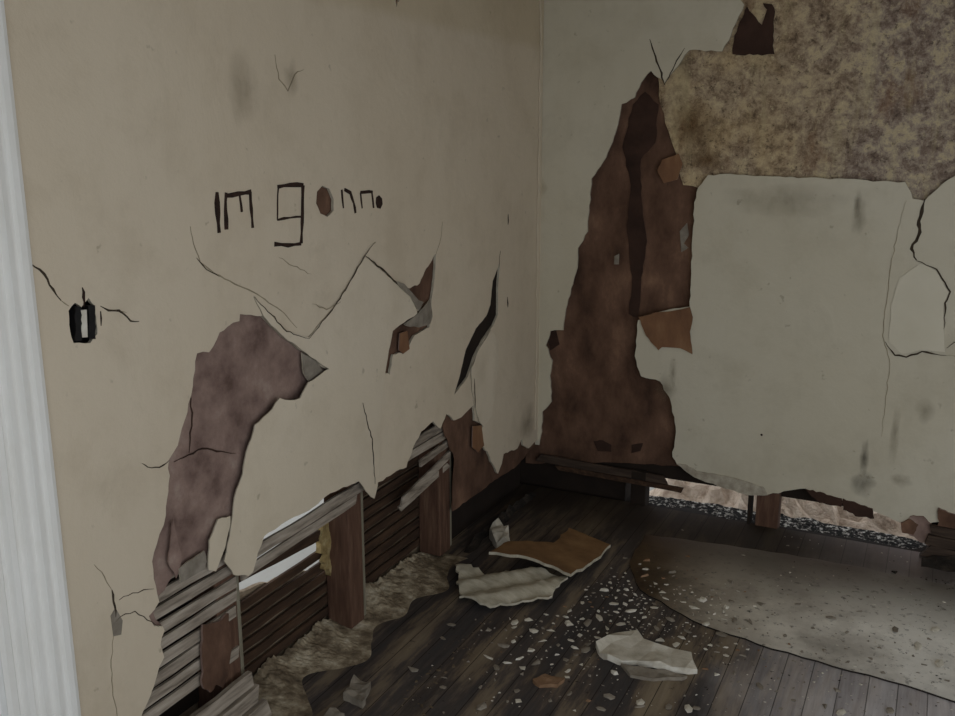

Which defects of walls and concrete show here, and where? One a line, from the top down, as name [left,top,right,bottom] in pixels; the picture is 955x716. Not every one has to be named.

crack [32,264,69,306]
crack [100,306,139,326]
crack [190,226,297,328]
crack [456,251,509,427]
flaking render [442,0,955,539]
crack [881,199,955,436]
flaking render [143,222,443,716]